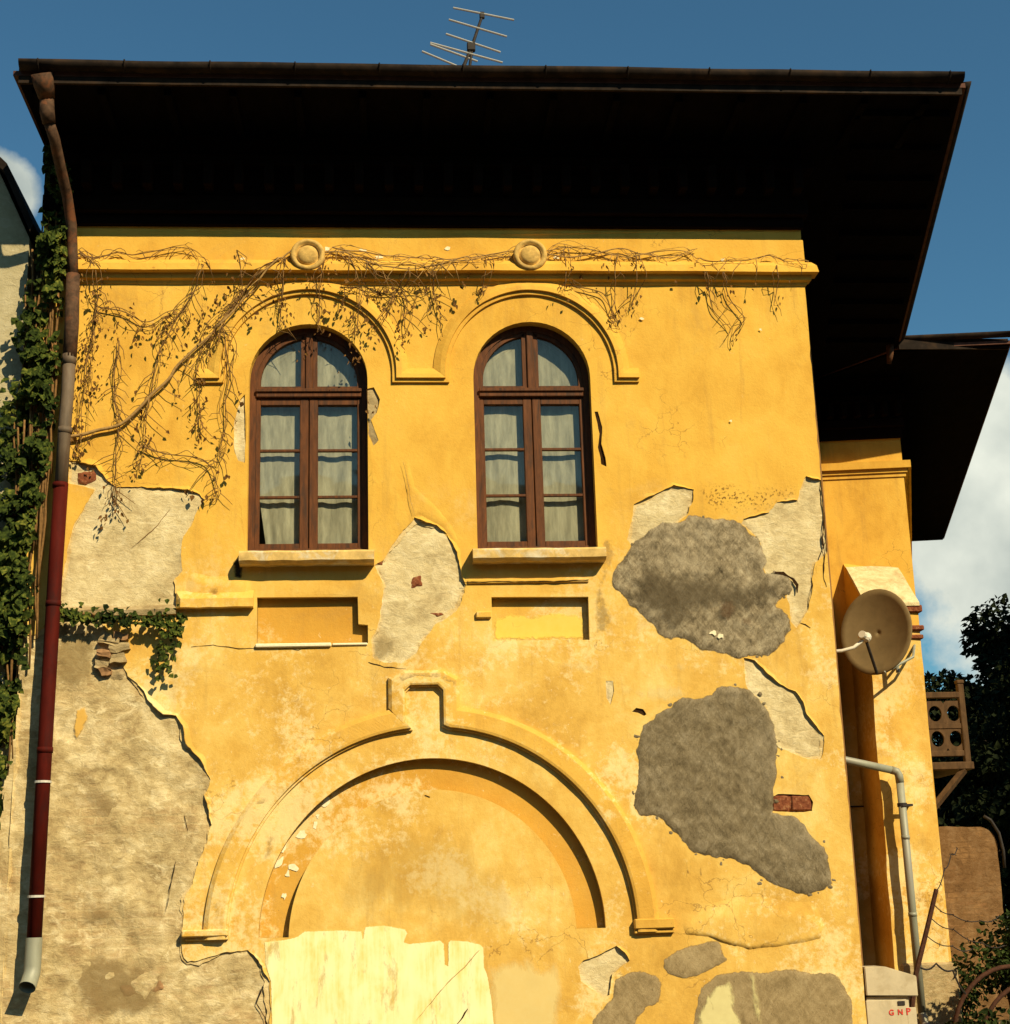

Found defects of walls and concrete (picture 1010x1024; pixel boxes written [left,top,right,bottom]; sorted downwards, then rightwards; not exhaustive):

flaking render [234,396,246,463]
flaking render [367,388,380,446]
flaking render [371,516,466,663]
flaking render [627,482,694,545]
flaking render [741,475,827,628]
flaking render [0,458,271,1024]
flaking render [744,658,824,759]
peeling [275,797,330,876]
flaking render [773,794,812,812]
flaking render [578,946,630,998]